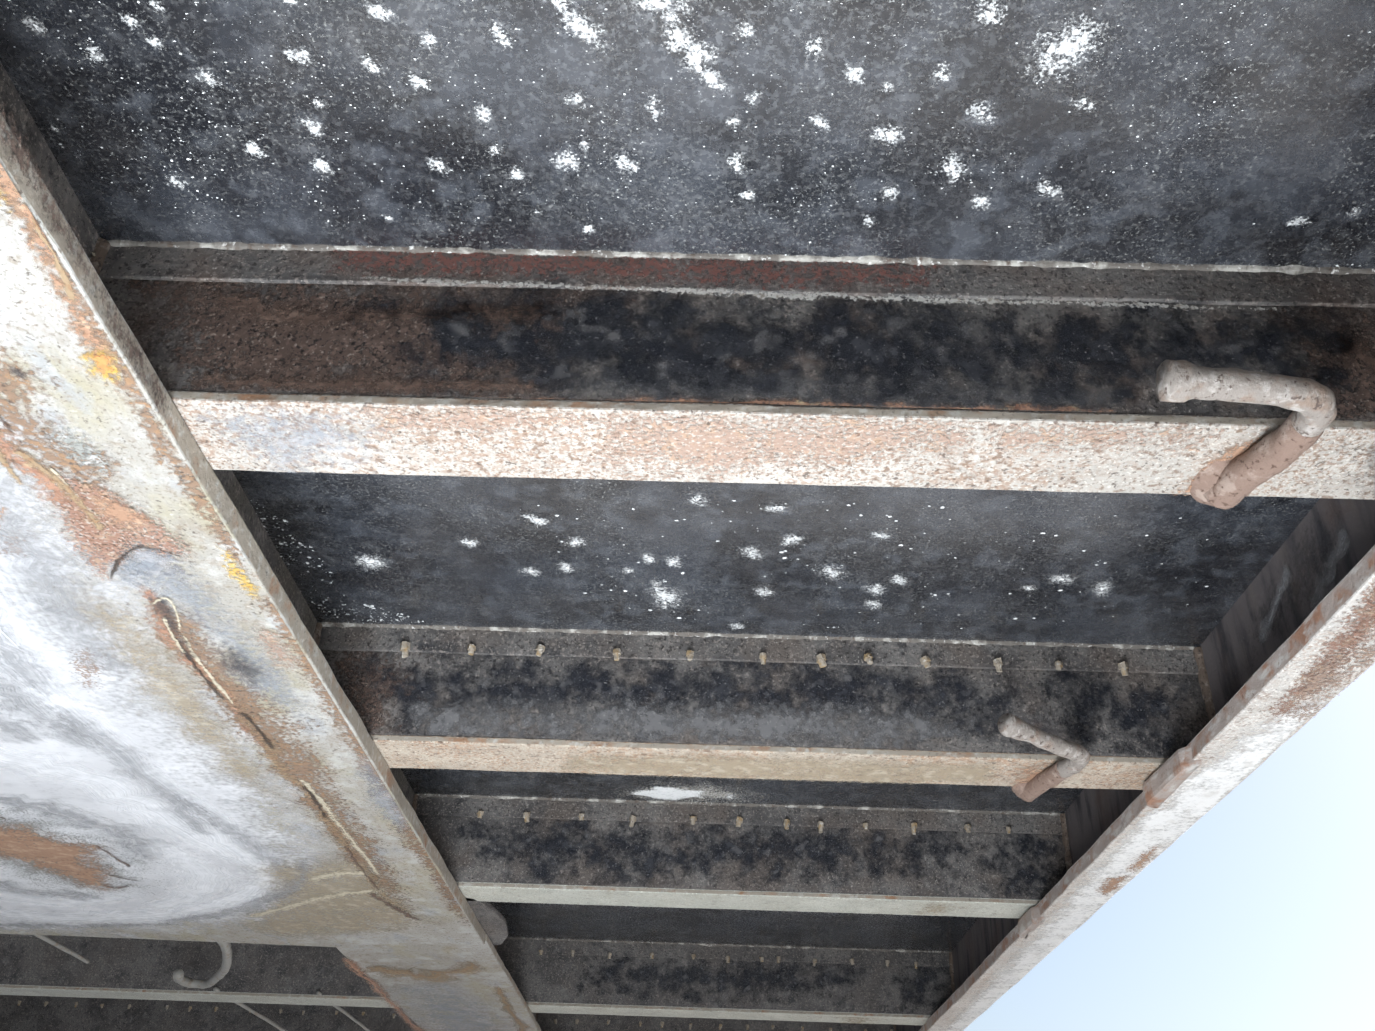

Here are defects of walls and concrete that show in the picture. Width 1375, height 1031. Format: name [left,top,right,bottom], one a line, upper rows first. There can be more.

leakage [0,467,428,936]
corrosion [0,107,1260,926]
leakage [361,276,1277,311]